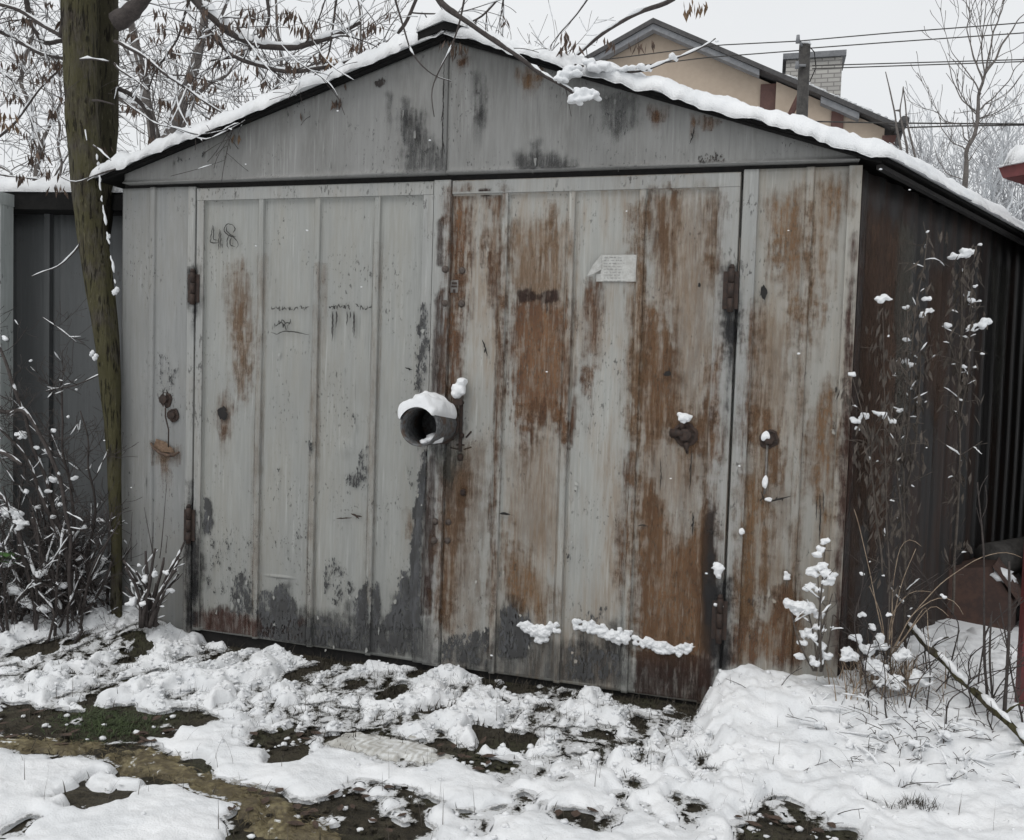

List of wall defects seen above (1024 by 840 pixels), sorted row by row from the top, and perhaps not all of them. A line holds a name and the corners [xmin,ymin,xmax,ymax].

corrosion [655,191,679,294]
corrosion [767,181,849,321]
corrosion [233,265,252,388]
corrosion [420,457,472,620]
corrosion [432,184,604,616]
corrosion [615,209,723,702]
corrosion [729,313,805,668]
corrosion [194,606,307,640]
damp [456,604,623,684]